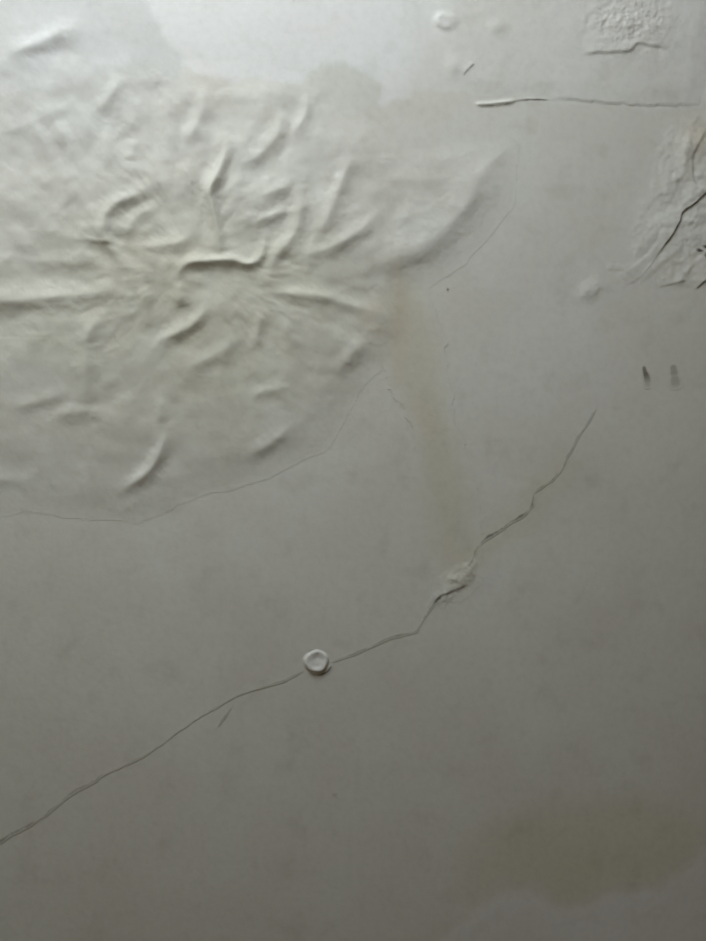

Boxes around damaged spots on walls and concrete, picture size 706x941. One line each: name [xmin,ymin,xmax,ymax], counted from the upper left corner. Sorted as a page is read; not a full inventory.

crack [469,93,559,110]
crack [645,192,706,272]
damp [641,365,653,389]
crack [0,409,596,843]
damp [440,779,706,924]